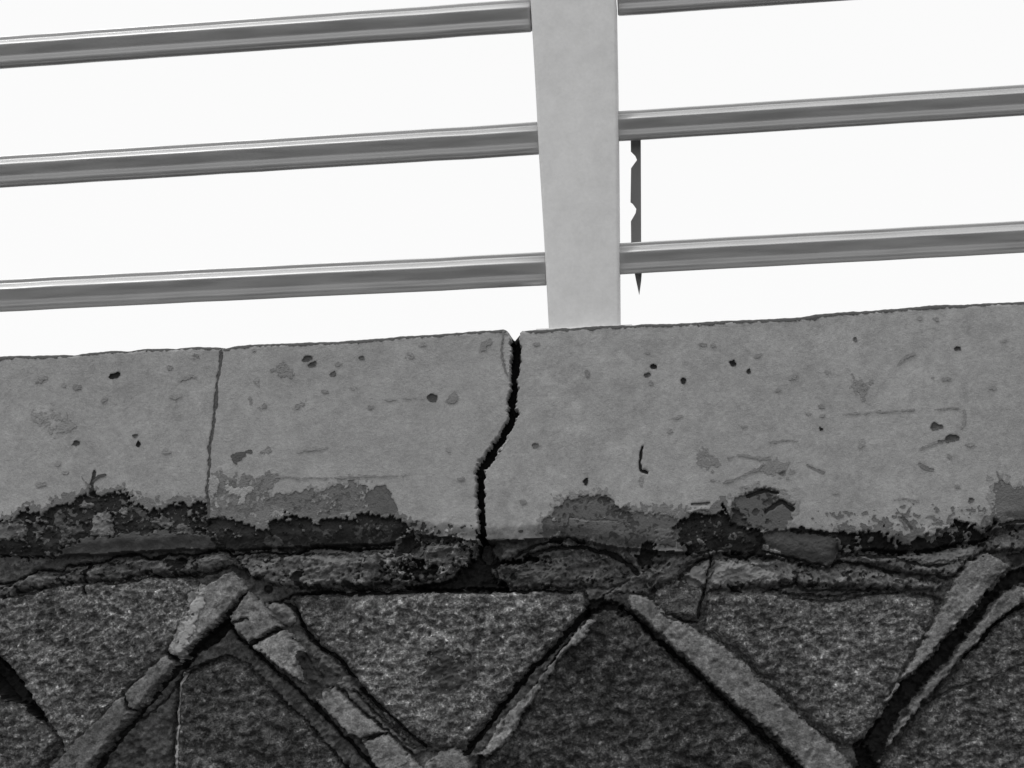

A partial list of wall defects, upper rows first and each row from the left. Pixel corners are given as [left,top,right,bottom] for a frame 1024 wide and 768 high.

crack [97,330,641,768]
spalling [0,475,1024,768]